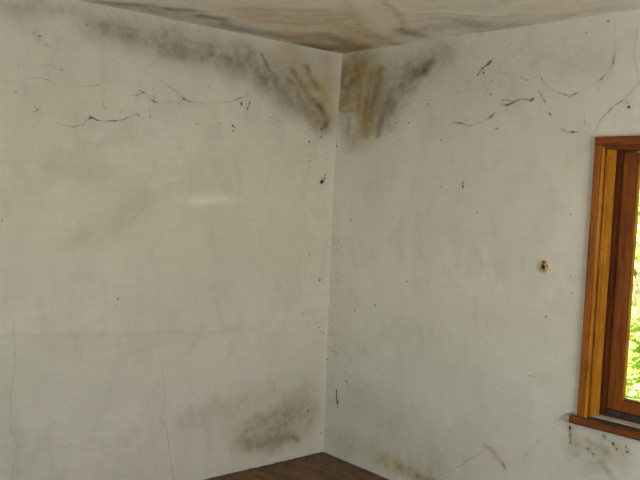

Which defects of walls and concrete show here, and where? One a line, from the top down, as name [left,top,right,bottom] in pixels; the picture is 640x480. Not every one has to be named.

water stain [0,0,640,158]
water stain [154,366,470,480]
water stain [558,411,640,480]